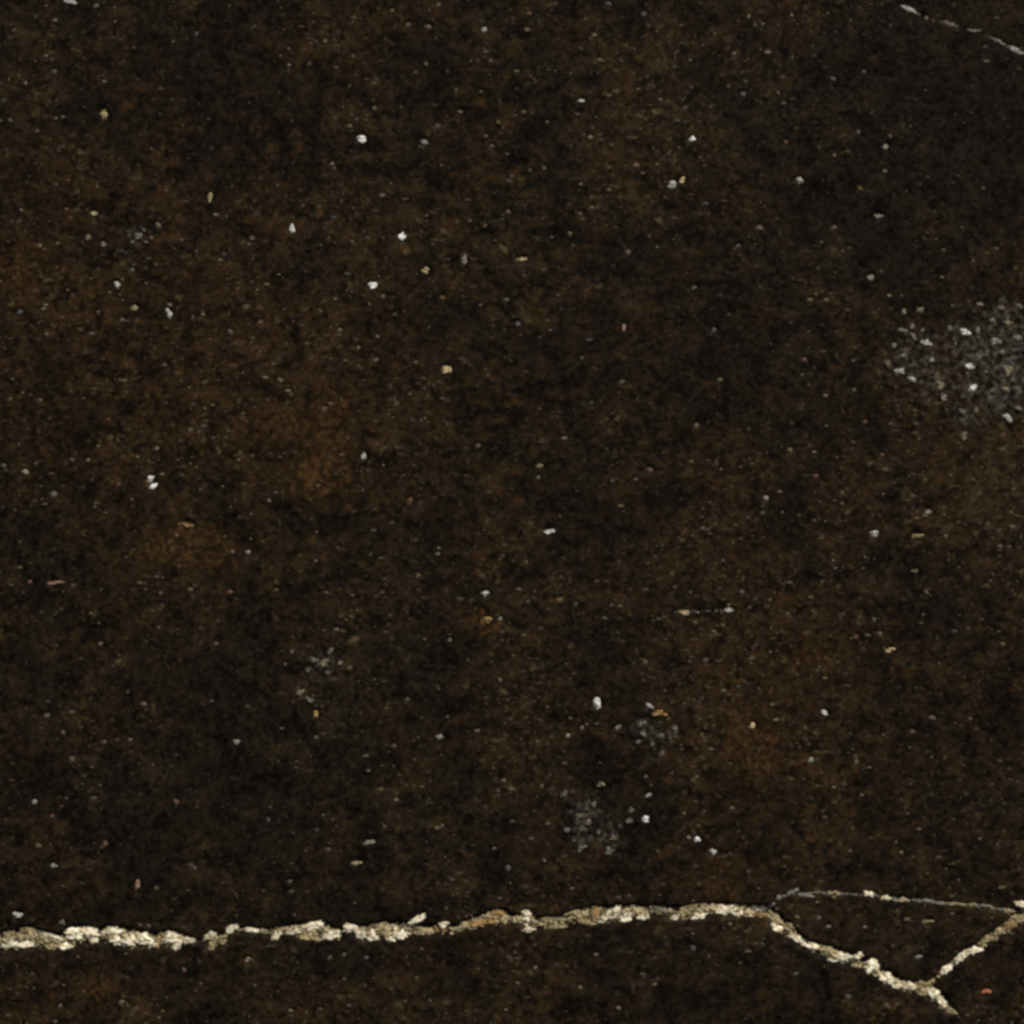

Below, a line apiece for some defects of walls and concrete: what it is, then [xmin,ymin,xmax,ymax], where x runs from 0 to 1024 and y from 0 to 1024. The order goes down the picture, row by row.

crack [0,888,1024,1018]